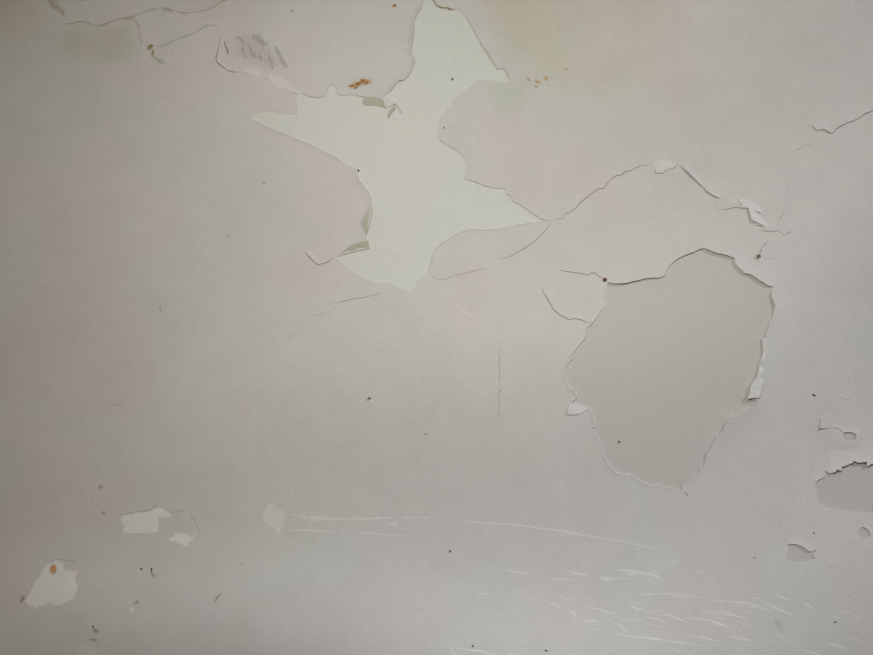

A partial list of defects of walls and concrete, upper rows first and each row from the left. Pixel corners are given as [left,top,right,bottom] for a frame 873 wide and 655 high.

rust [348,77,374,89]
peeling [241,0,554,290]
peeling [559,230,792,497]
peeling [810,434,873,540]